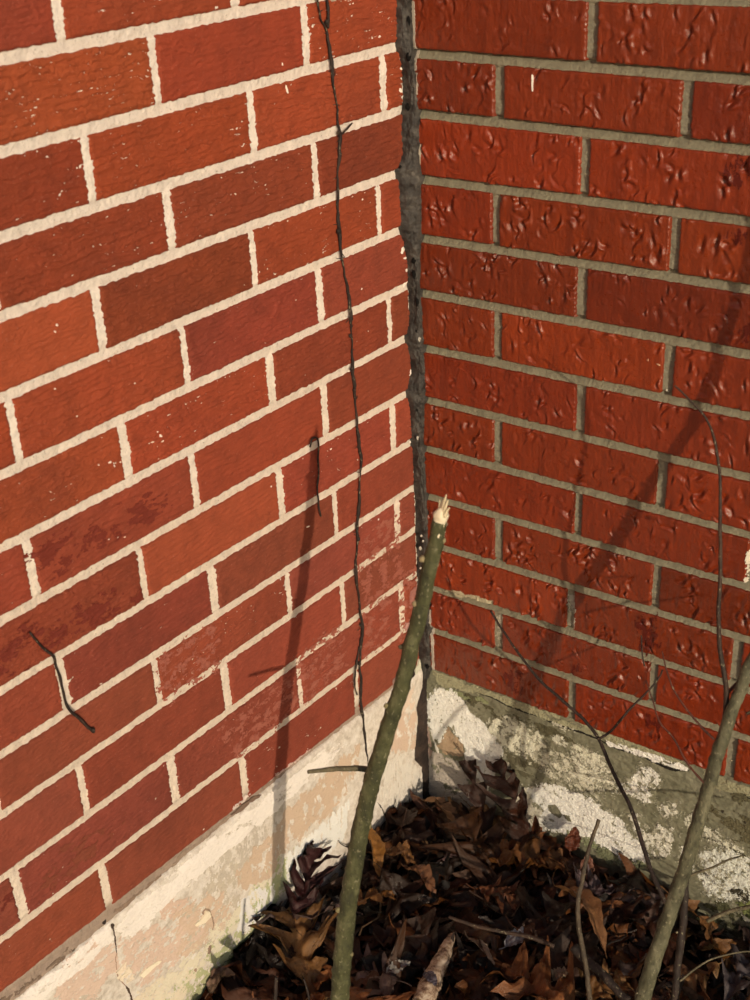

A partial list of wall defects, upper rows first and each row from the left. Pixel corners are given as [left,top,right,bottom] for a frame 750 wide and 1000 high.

damp [464,693,576,744]
damp [505,752,556,785]
peeling [427,684,695,865]
damp [606,740,689,771]
spalling [730,793,750,806]
damp [707,804,750,855]
peeling [692,826,750,923]
damp [690,912,750,939]